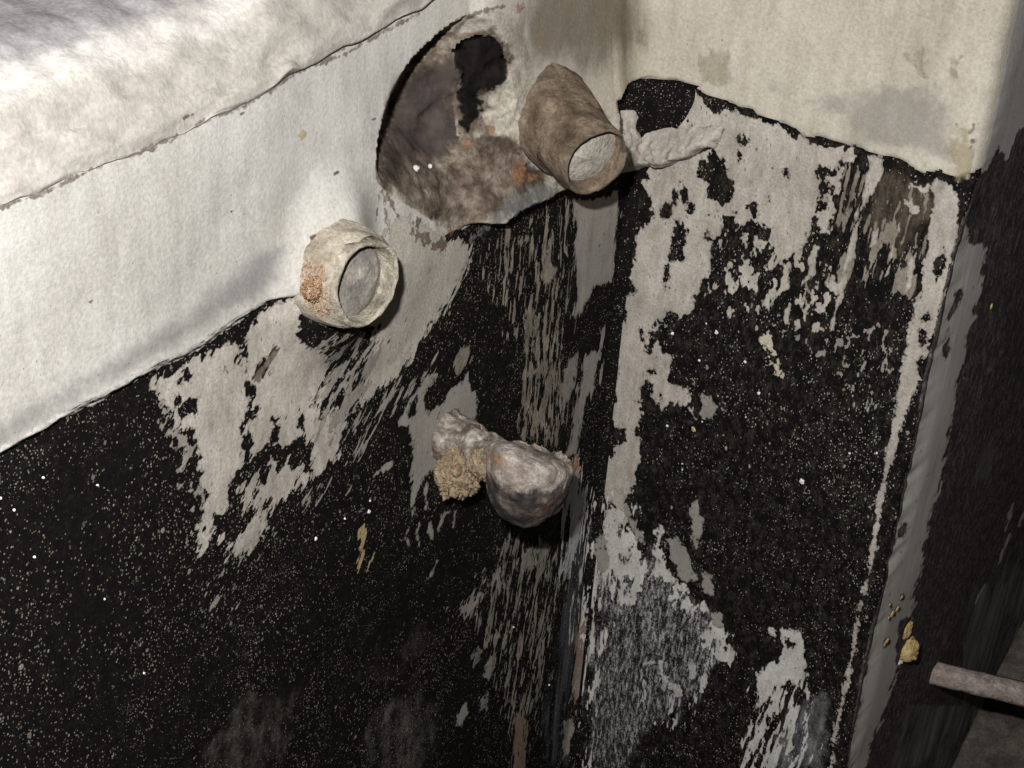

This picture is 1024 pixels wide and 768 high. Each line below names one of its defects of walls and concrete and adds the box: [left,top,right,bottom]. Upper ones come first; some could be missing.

rust [299,258,332,317]
peeling [149,10,622,612]
peeling [604,90,988,768]
peeling [998,503,1024,564]
peeling [455,528,577,741]
peeling [568,668,582,704]
peeling [560,718,575,764]